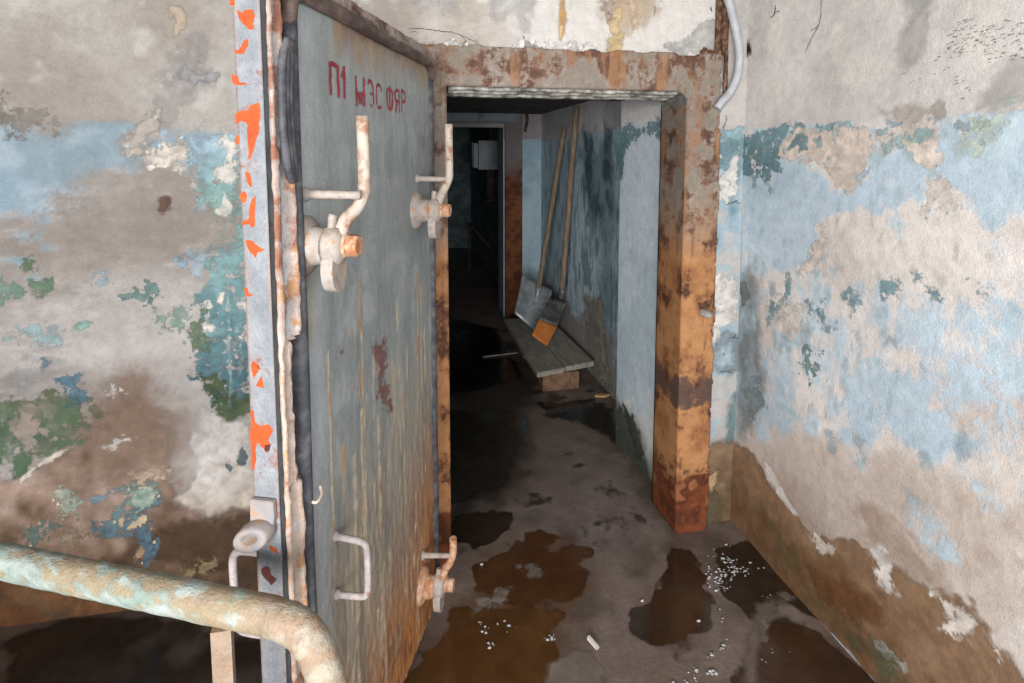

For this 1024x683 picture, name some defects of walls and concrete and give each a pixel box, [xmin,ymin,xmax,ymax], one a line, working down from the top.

peeling [121,117,191,175]
peeling [213,103,264,260]
leakage [584,131,611,202]
peeling [772,117,959,221]
peeling [190,292,225,339]
leakage [740,281,750,320]
leakage [0,283,258,591]
peeling [113,463,172,564]
leakage [706,380,1024,683]
leakage [0,581,130,627]
peeling [866,543,901,596]
peeling [929,586,977,642]